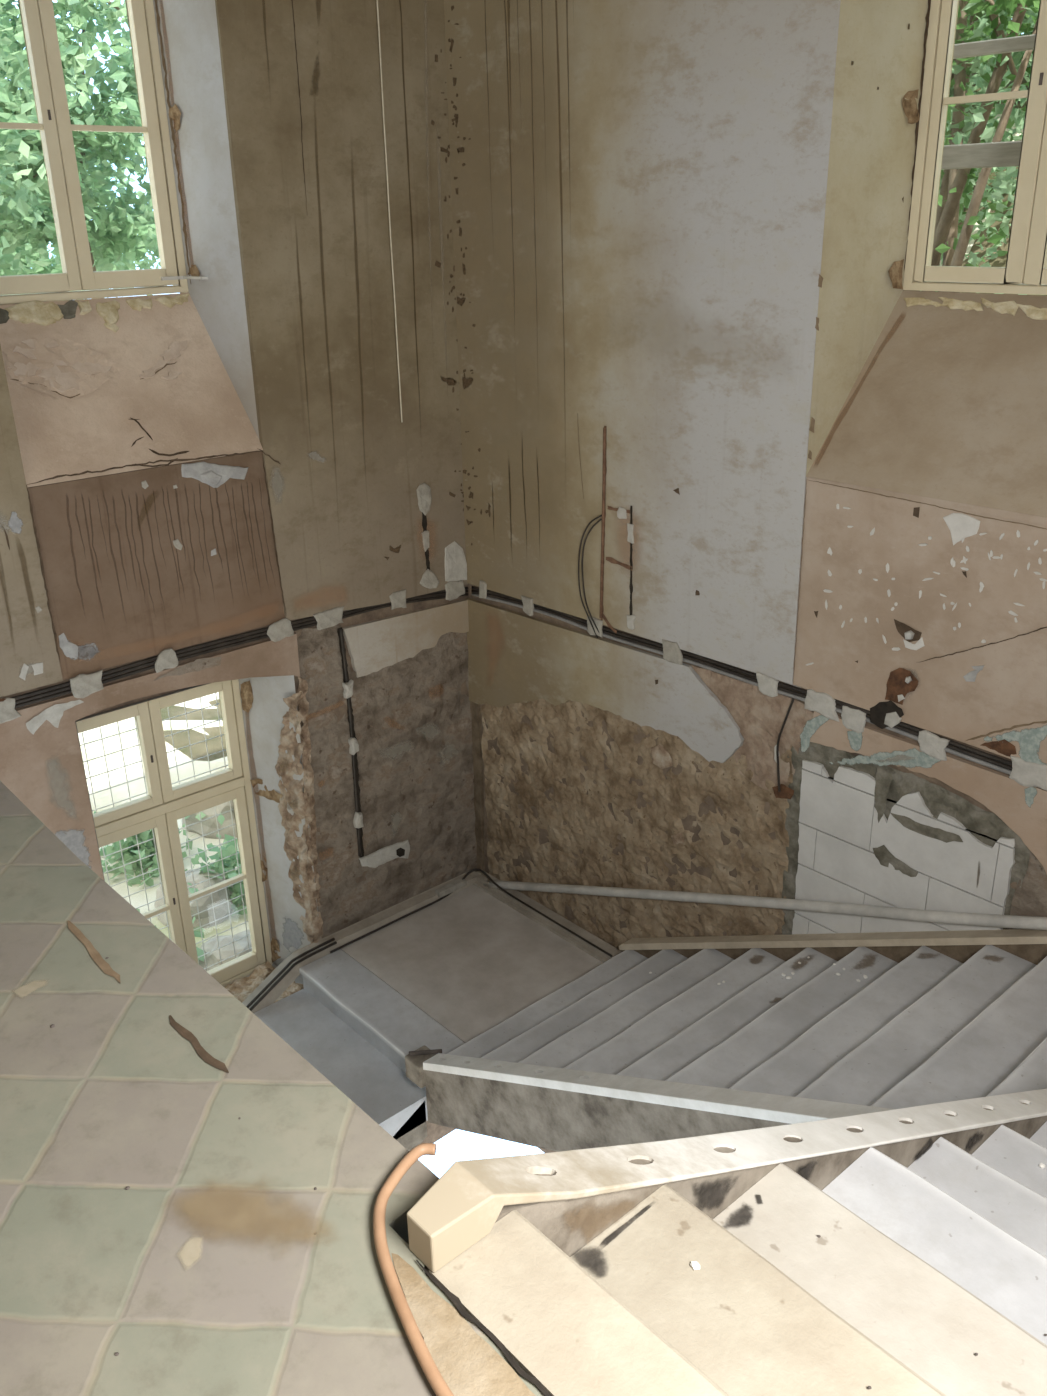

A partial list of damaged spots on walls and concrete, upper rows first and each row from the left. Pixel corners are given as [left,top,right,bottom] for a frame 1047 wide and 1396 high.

crack [292,0,307,209]
water stain [504,0,569,317]
crack [0,418,287,659]
water stain [492,453,540,536]
spalling [814,547,924,651]
peeling [919,513,1047,631]
flaking render [250,625,829,963]
peeling [829,668,941,768]
peeling [966,720,1047,765]